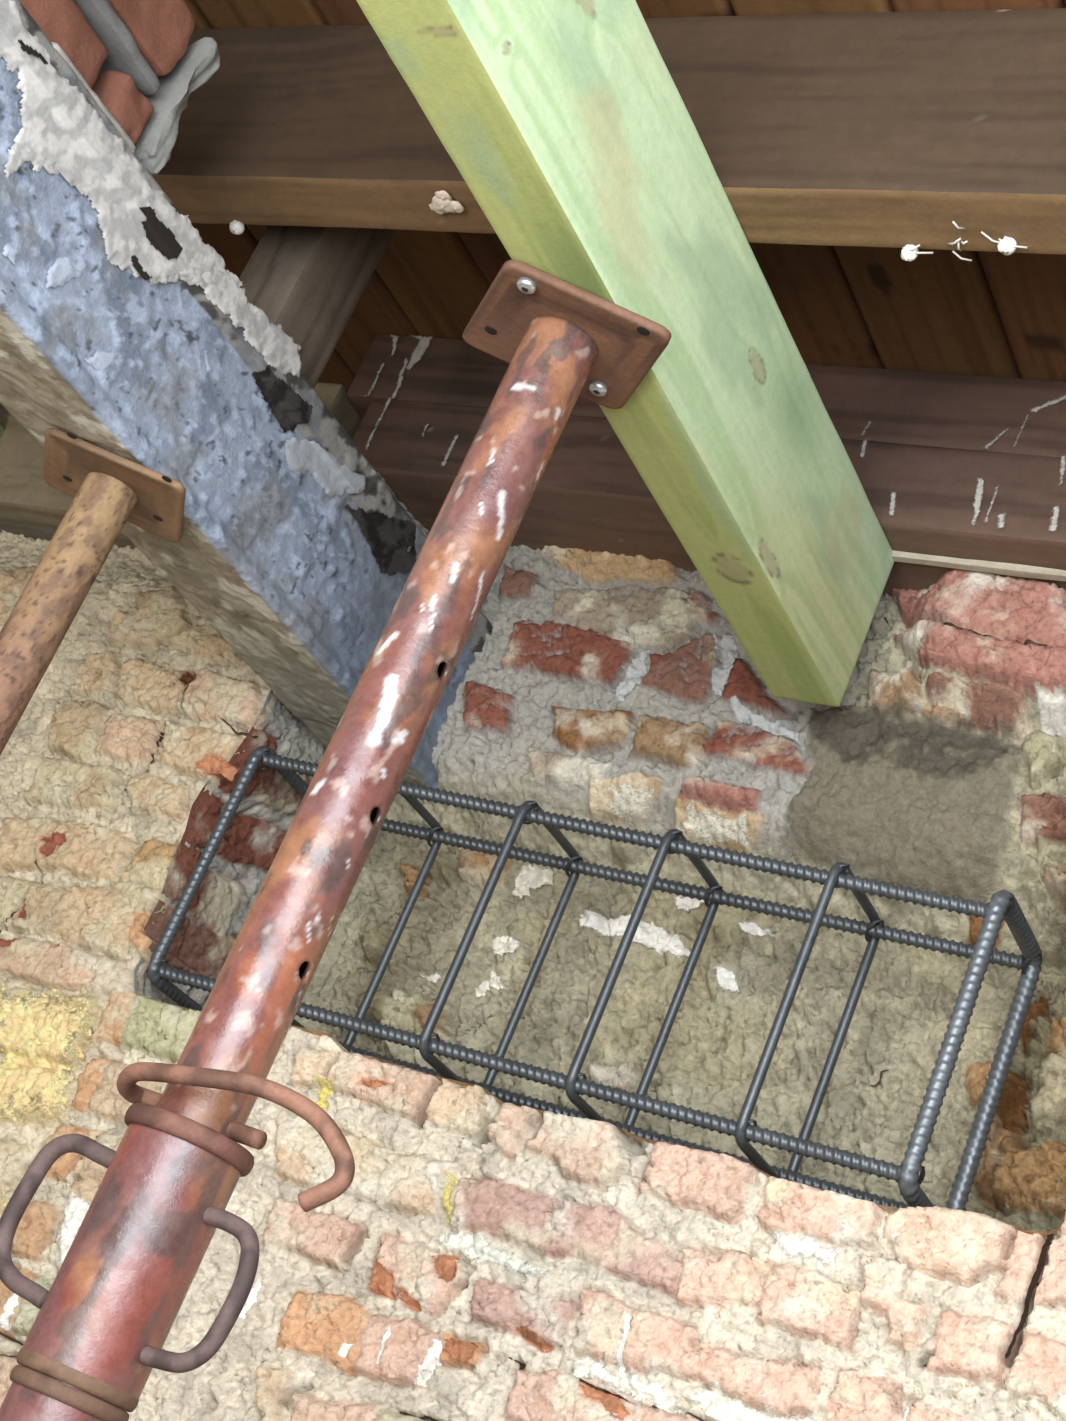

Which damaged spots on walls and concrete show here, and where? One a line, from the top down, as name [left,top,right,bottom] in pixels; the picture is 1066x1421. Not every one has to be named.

peeling [0,0,419,576]
spalling [179,672,196,686]
spalling [197,755,239,781]
spalling [363,1080,386,1089]
crack [1005,1230,1054,1359]